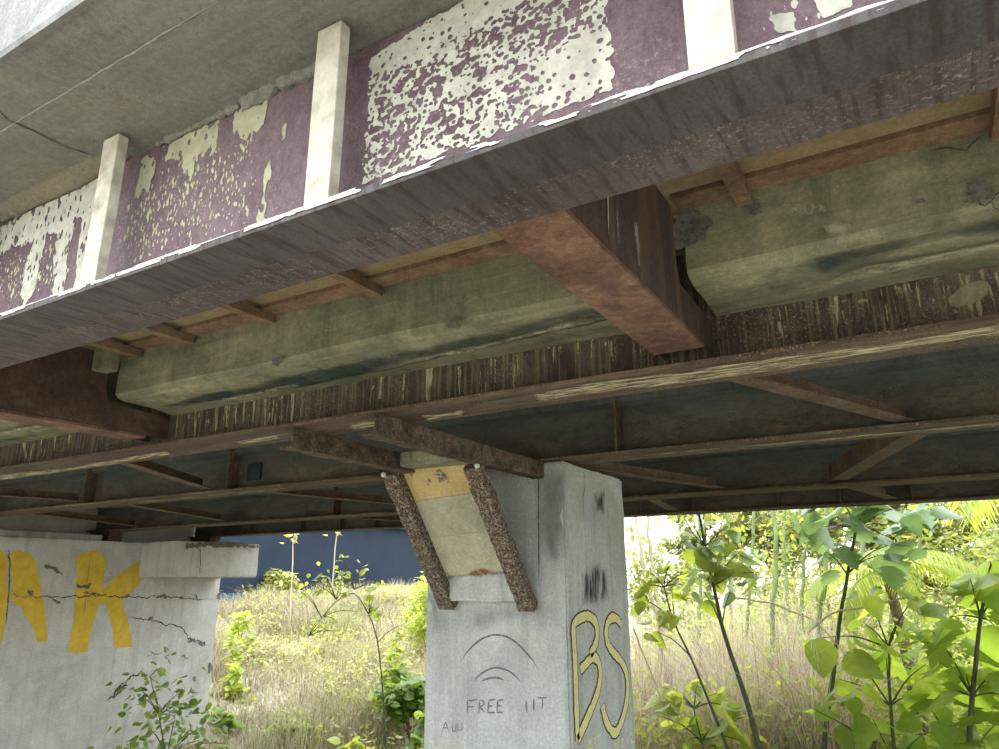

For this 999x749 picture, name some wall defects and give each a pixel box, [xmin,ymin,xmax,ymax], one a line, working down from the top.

peeling [814,0,852,18]
crack [0,0,221,157]
peeling [134,120,219,198]
peeling [233,99,268,141]
peeling [244,0,797,232]
peeling [0,178,200,317]
damp [815,223,999,283]
damp [831,296,850,326]
damp [399,311,604,401]
damp [170,360,386,437]
crack [6,549,220,701]